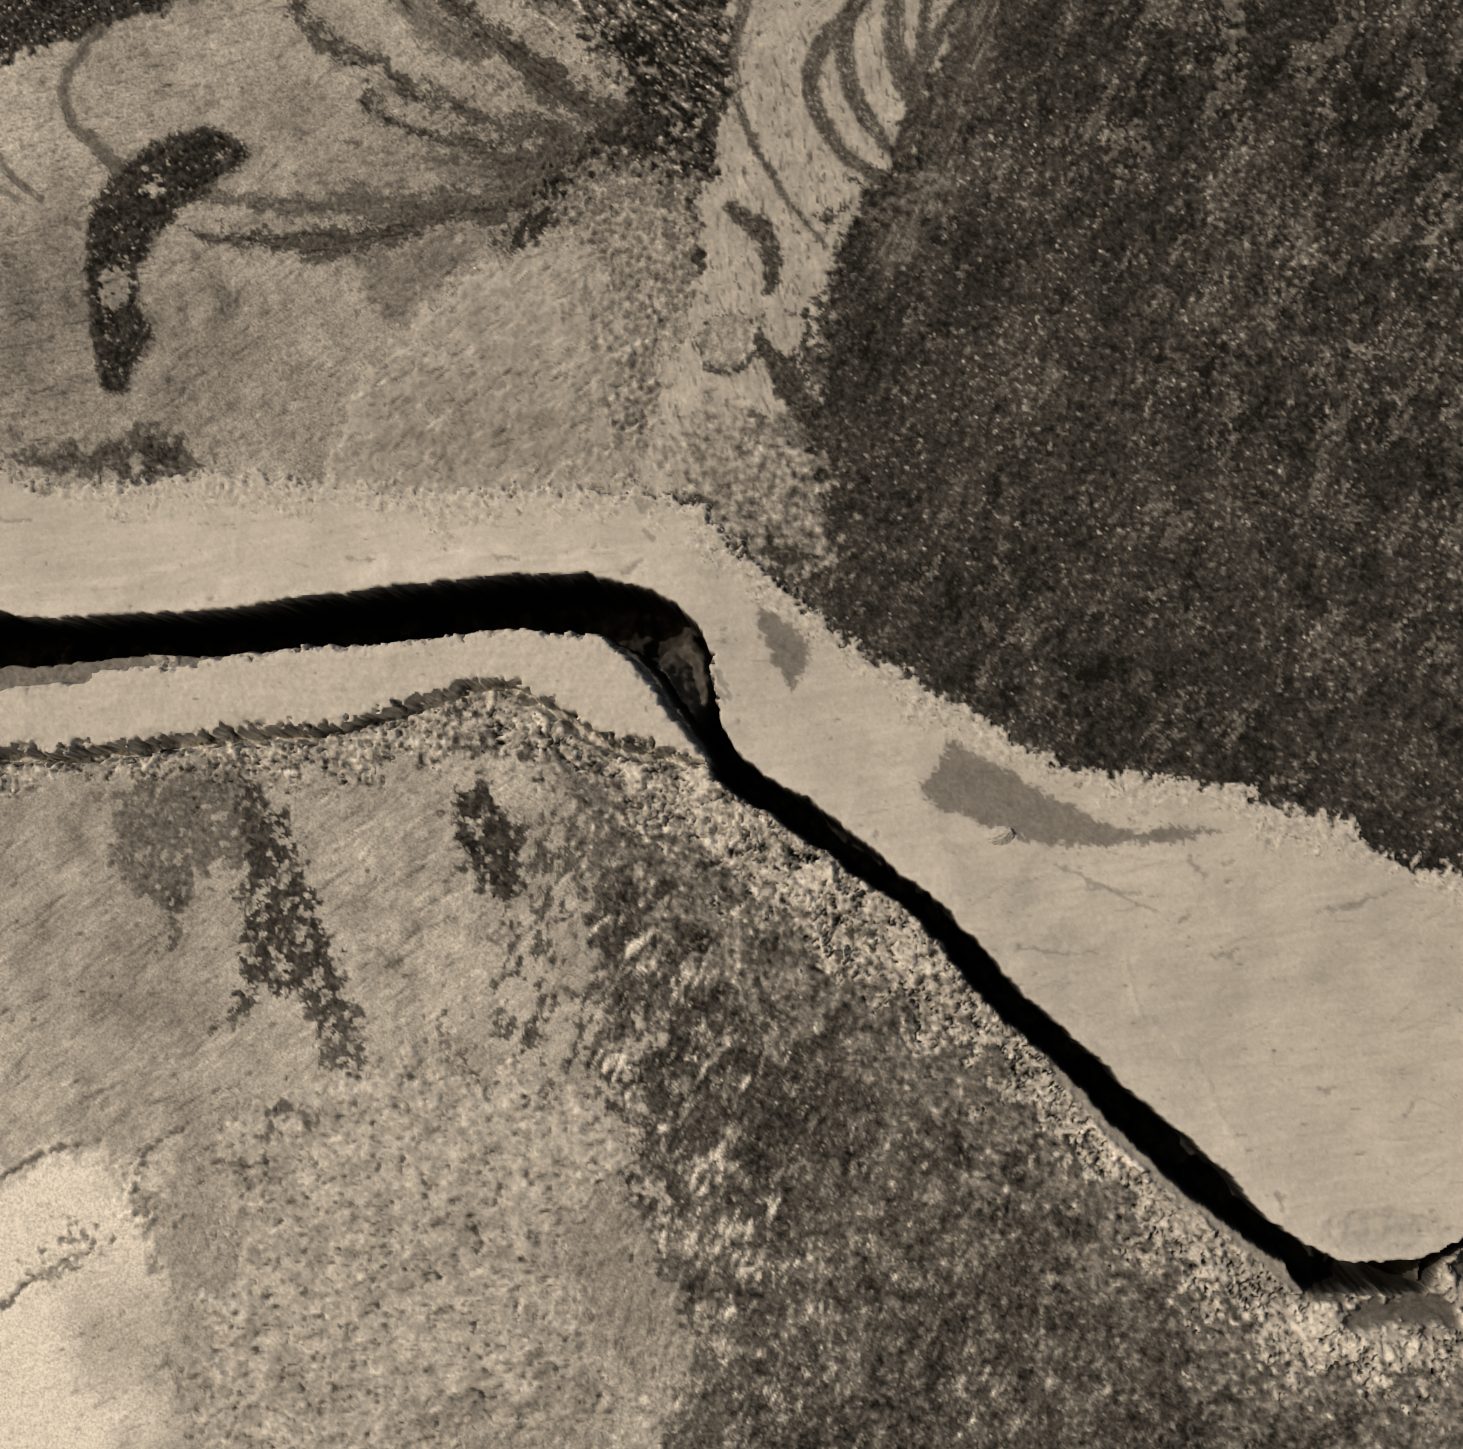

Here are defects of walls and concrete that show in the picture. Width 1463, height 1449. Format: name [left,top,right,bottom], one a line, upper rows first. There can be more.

crack [0,1248,97,1314]
crack [0,571,1463,1296]